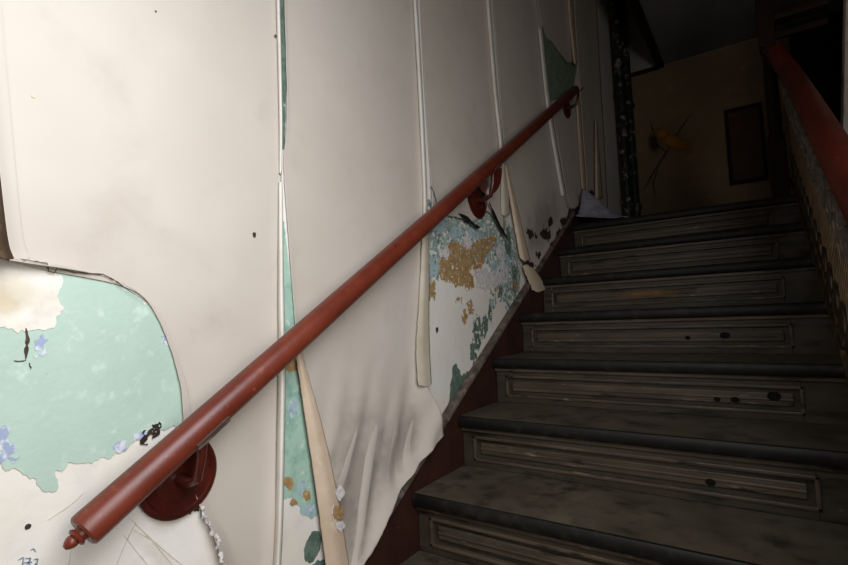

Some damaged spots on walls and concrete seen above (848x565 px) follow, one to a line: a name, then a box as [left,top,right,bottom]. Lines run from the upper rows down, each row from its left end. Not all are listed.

peeling [542,26,577,101]
peeling [283,221,295,333]
peeling [429,211,521,404]
peeling [0,260,183,492]
peeling [284,358,319,520]
flaking render [199,506,226,565]
peeling [304,531,325,565]
peeling [331,485,345,532]